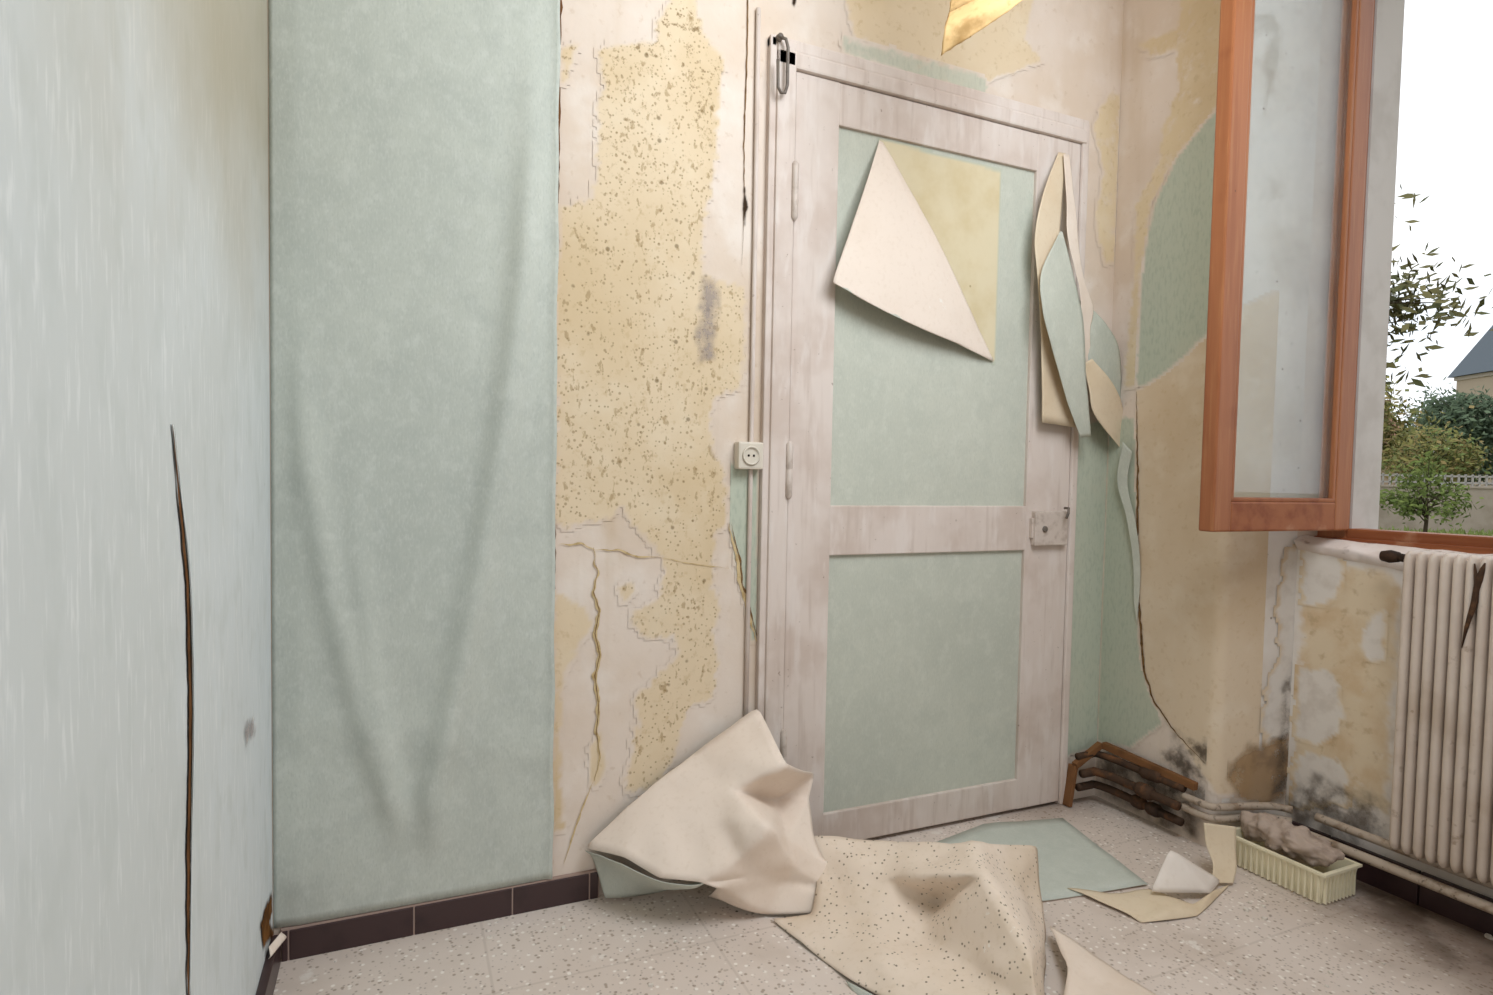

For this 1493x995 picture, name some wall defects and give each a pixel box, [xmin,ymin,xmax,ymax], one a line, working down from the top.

peeling [845,0,1045,84]
peeling [878,138,1002,365]
peeling [555,0,751,797]
peeling [553,589,596,836]
crack [564,542,729,862]
leakage [1228,561,1403,832]